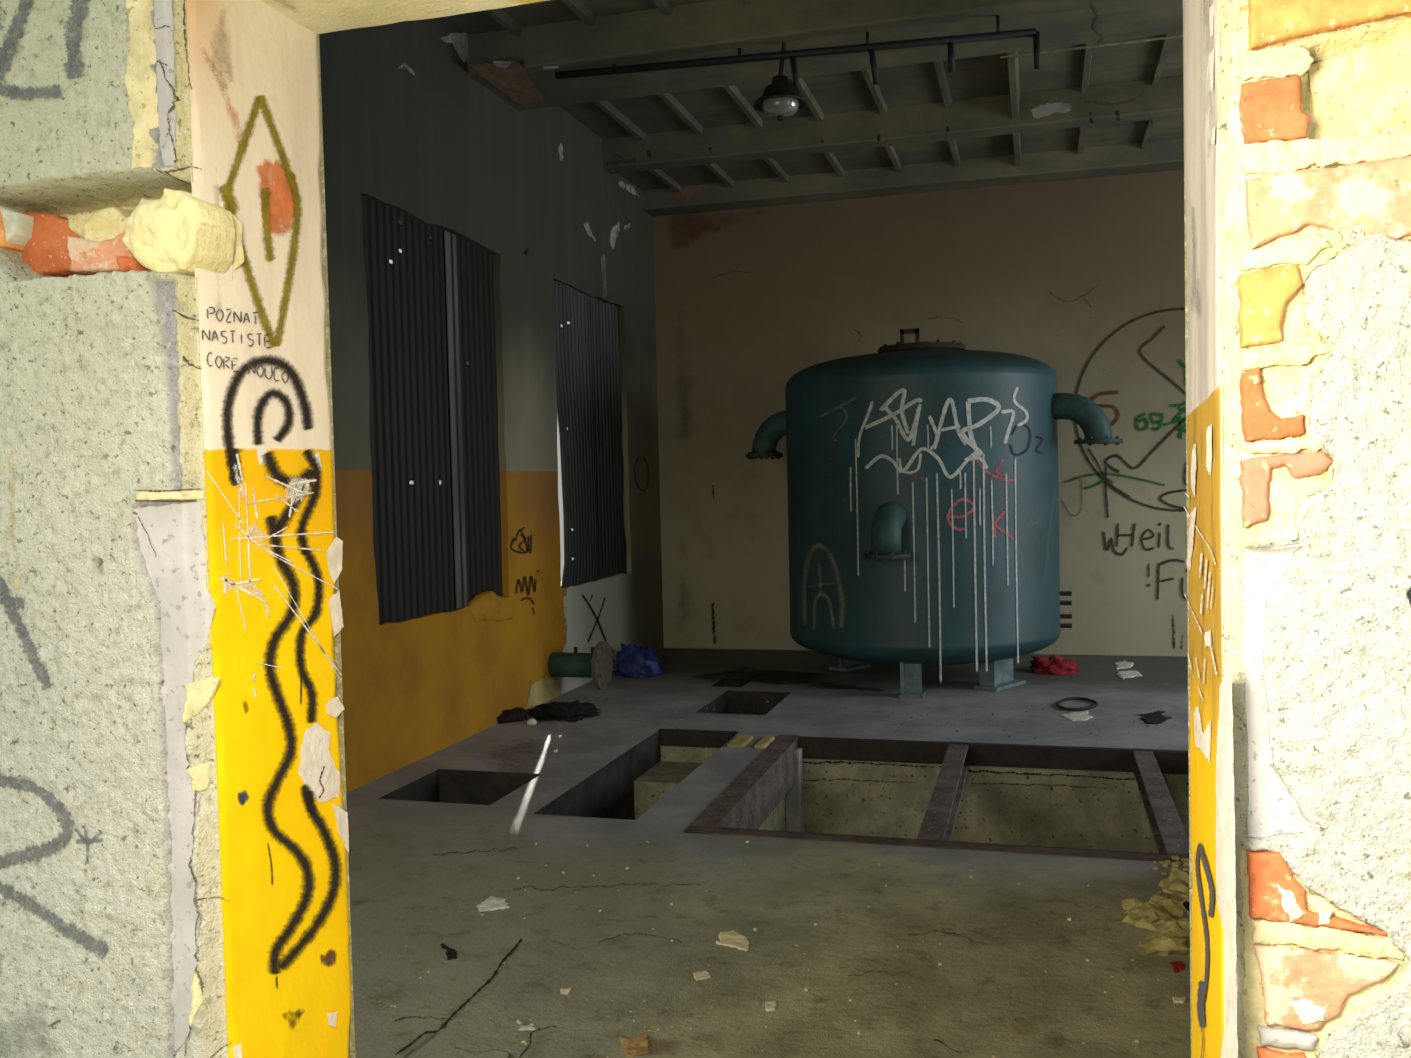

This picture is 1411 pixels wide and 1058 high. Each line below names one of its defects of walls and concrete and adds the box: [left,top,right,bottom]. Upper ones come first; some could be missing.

flaking render [1187,0,1411,1058]
peeling [525,677,560,709]
flaking render [134,502,220,1056]
peeling [298,696,349,854]
crack [395,939,522,1054]